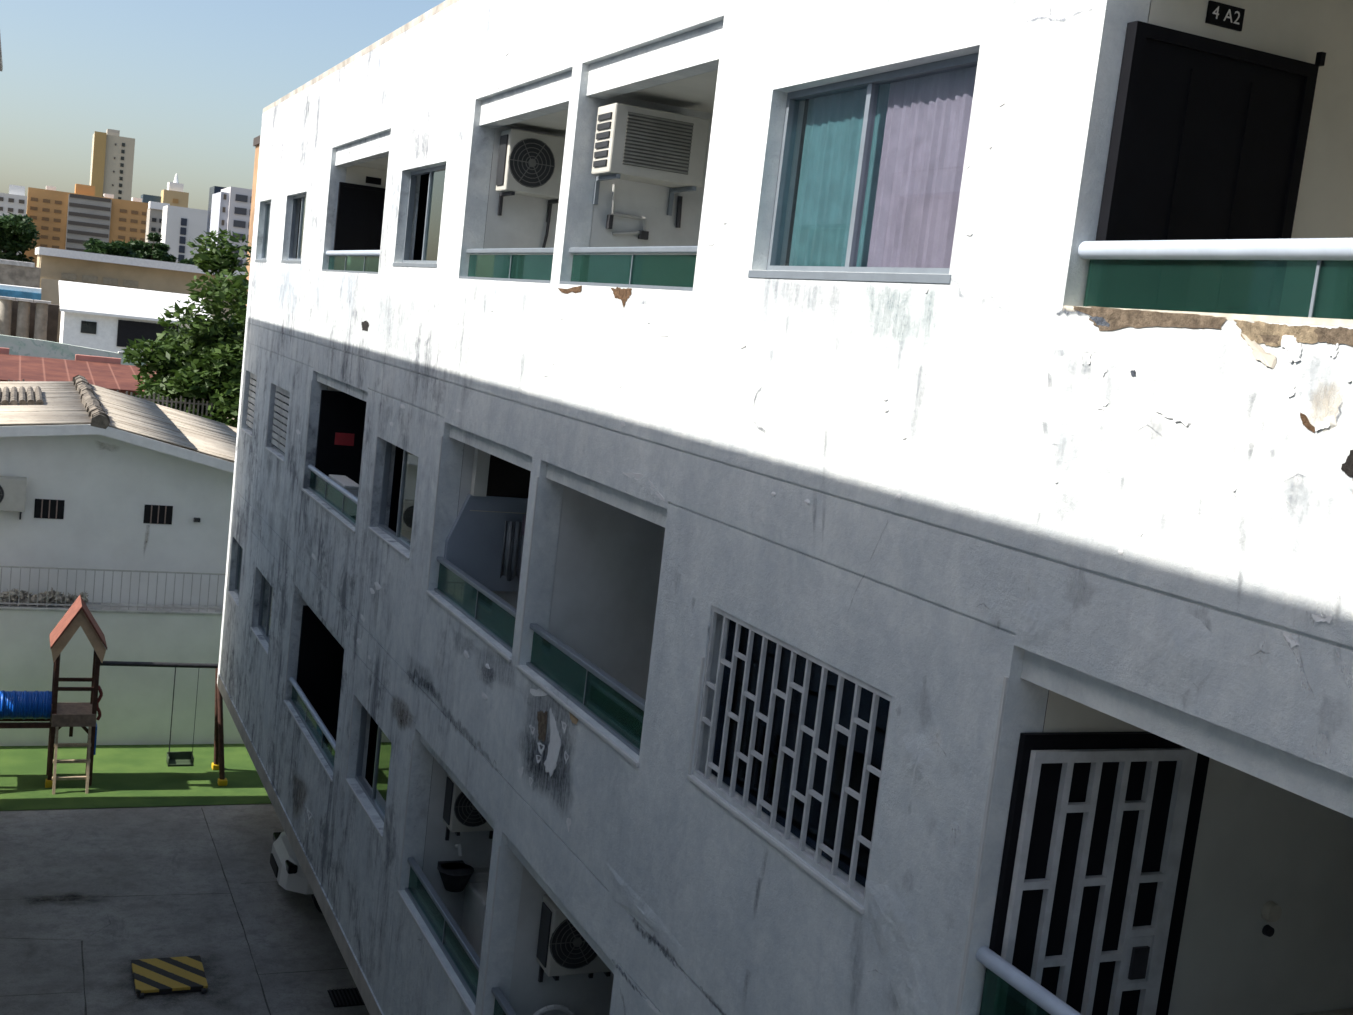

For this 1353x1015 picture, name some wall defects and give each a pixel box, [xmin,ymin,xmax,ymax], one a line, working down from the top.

crack [1026,9,1092,22]
corrosion [611,287,644,307]
flaking render [1073,306,1353,397]
flaking render [1300,387,1341,432]
flaking render [1341,450,1353,477]
peeling [517,687,579,791]